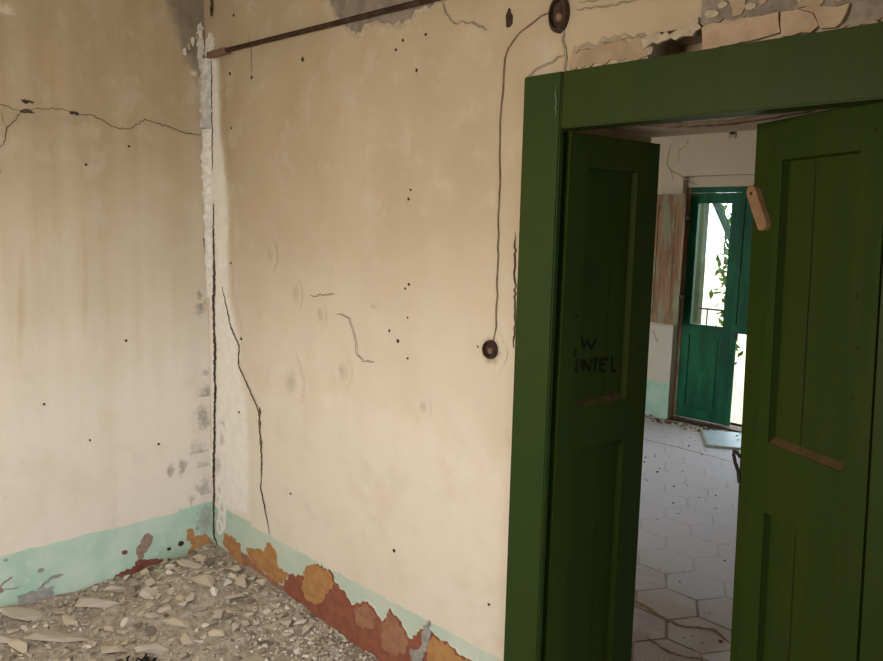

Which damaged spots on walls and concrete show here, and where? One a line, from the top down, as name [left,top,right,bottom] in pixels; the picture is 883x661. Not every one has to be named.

spalling [329,0,449,40]
spalling [569,0,883,70]
crack [0,61,213,169]
crack [203,204,269,545]
peeling [114,527,212,578]
peeling [223,533,479,661]